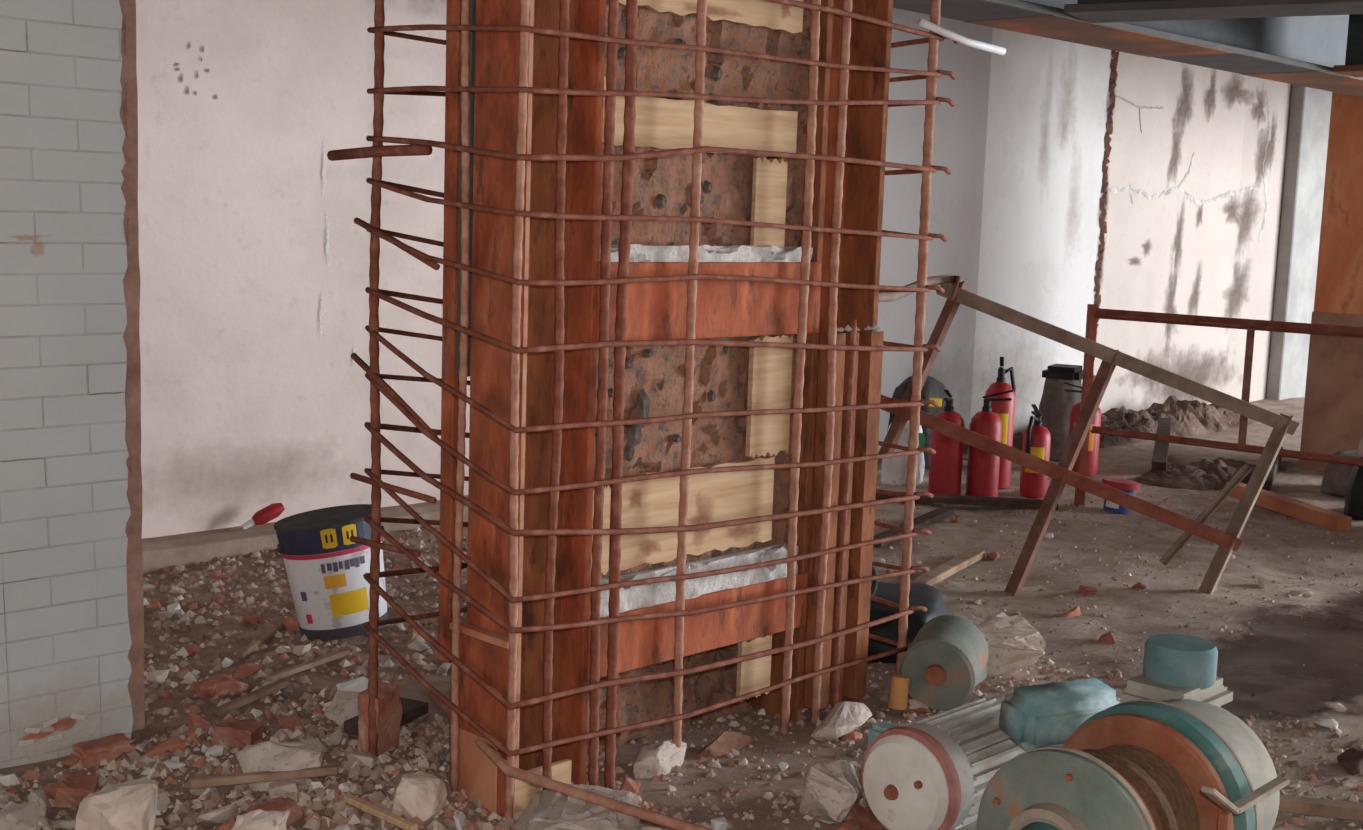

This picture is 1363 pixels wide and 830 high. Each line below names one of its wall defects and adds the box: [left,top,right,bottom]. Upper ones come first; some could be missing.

damp [1169,76,1192,174]
damp [1206,78,1275,180]
damp [1227,199,1256,243]
damp [1166,207,1202,337]
damp [1229,271,1246,318]
spalling [18,713,86,746]